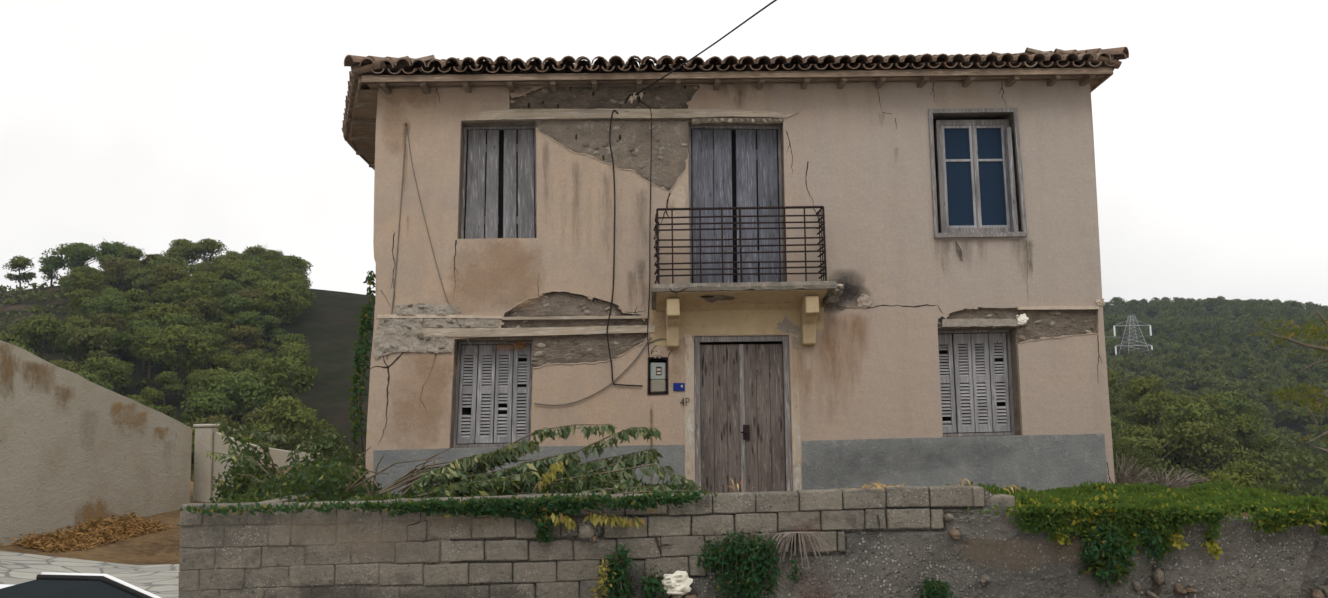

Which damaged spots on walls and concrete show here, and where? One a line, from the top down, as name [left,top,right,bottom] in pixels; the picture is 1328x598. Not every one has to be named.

flaking render [510,85,784,208]
flaking render [373,290,648,369]
crack [836,304,942,312]
flaking render [938,307,1099,344]
crack [370,352,437,446]